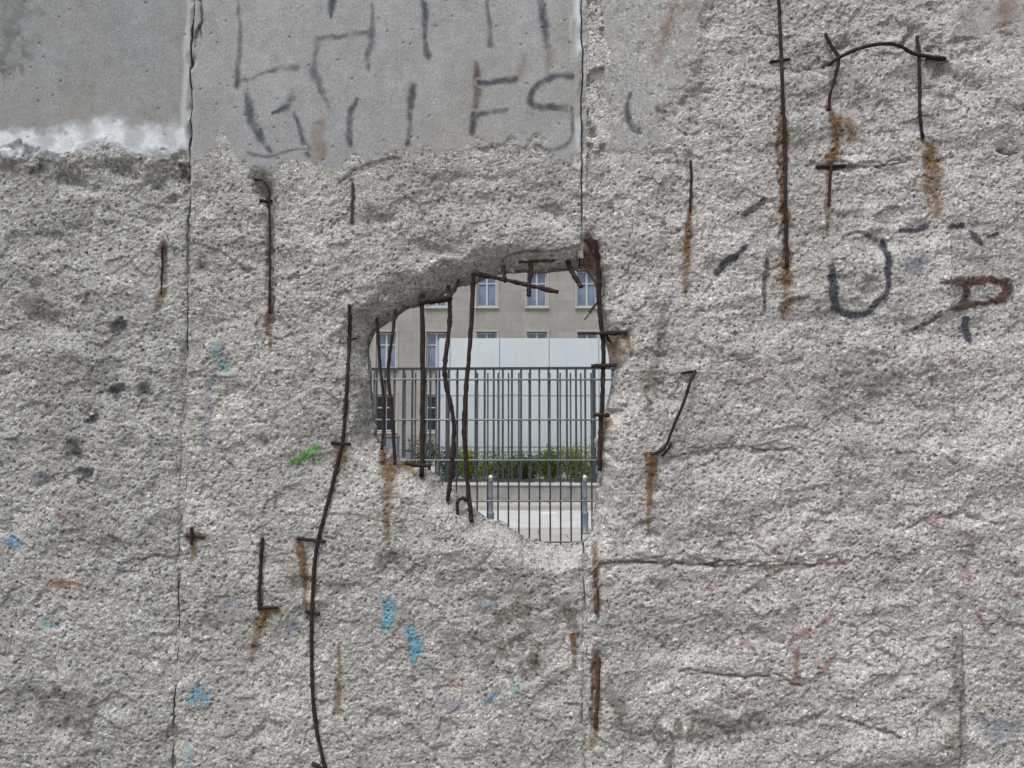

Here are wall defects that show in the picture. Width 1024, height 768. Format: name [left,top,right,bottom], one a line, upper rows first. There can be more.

damp [0,117,192,184]
corrosion [683,208,693,297]
corrosion [776,105,792,320]
corrosion [824,105,856,235]
corrosion [920,138,943,216]
corrosion [264,307,273,349]
spalling [0,133,586,768]
corrosion [379,448,418,541]
corrosion [644,452,659,532]
corrosion [295,540,309,615]
crack [645,555,740,567]
corrosion [251,603,283,660]